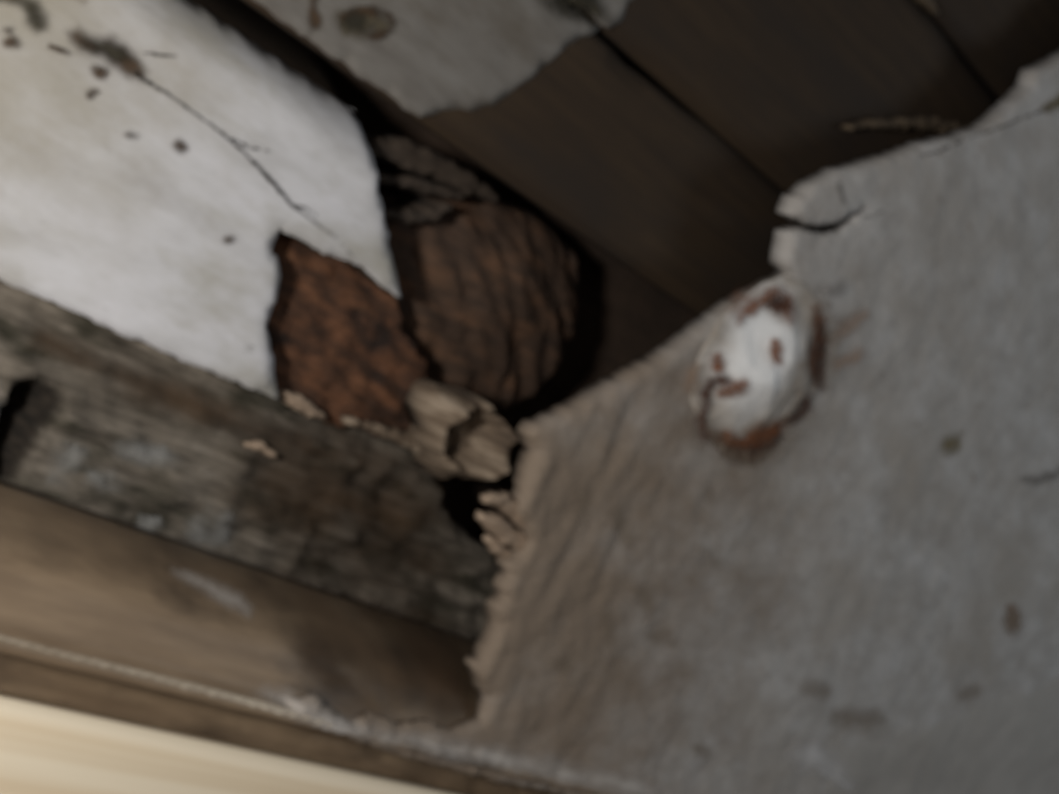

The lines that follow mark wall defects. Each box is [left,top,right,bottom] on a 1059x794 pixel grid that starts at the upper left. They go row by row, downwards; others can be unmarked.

crack [135,52,331,234]
crack [793,183,883,234]
spalling [266,231,430,439]
rust [738,287,794,325]
rust [687,307,866,463]
spalling [474,491,527,558]